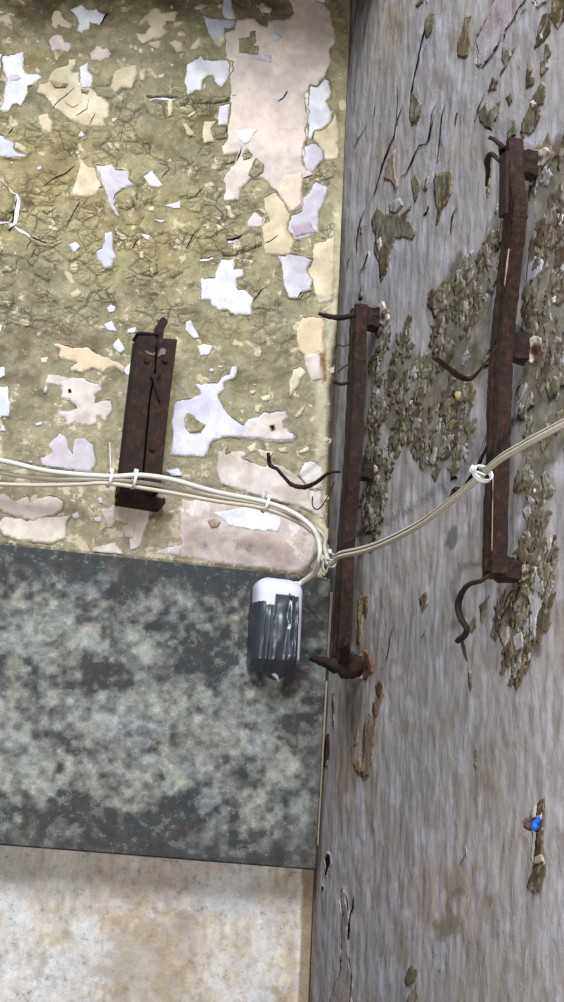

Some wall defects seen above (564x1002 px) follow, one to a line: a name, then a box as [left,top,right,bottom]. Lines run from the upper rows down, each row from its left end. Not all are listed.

crack [0,179,120,255]
crack [146,92,177,101]
peeling [0,0,341,304]
crack [187,232,241,261]
peeling [199,257,255,317]
peeling [360,148,453,282]
peeling [507,0,564,139]
peeling [27,305,137,473]
peeling [150,315,327,574]
peeling [357,203,503,558]
peeling [469,131,564,690]
peeling [0,492,80,545]